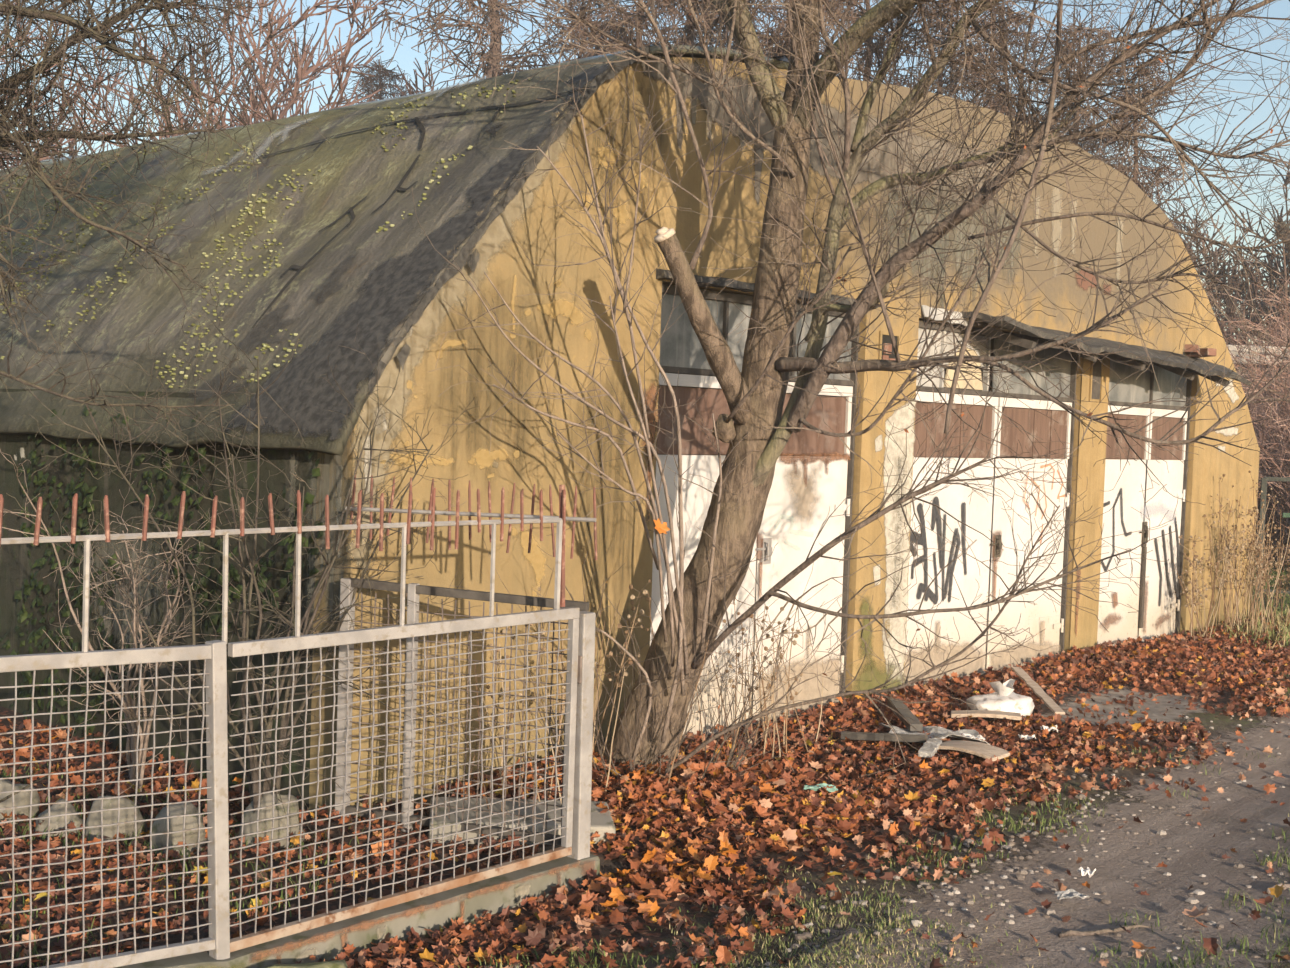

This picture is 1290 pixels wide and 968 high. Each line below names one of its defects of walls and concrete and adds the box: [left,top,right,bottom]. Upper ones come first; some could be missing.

peeling [310,254,357,303]
peeling [190,304,294,400]
flaking render [348,101,591,568]